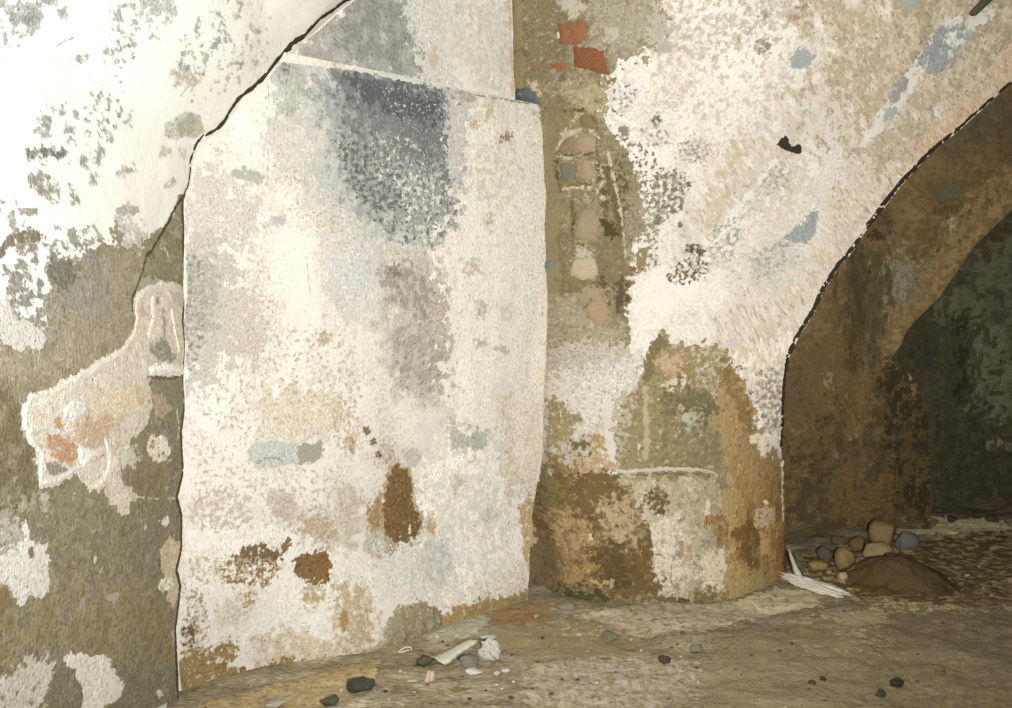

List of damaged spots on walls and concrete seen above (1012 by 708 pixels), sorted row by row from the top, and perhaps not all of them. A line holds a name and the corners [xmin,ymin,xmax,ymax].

spalling [158,111,205,160]
crack [131,0,350,312]
peeling [369,0,672,453]
crack [780,82,1012,447]
crack [130,303,185,701]
rust [213,536,333,617]
rust [187,321,441,560]